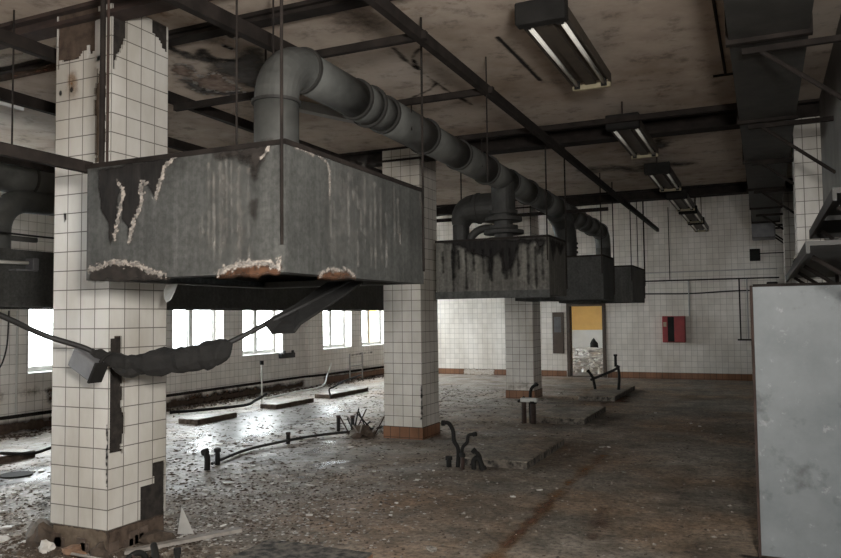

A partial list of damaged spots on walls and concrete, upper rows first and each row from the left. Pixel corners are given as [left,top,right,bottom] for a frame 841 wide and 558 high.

peeling [0,53,39,67]
water stain [168,47,265,88]
peeling [58,7,177,244]
water stain [442,239,565,292]
peeling [110,337,121,353]
peeling [106,367,124,487]
peeling [53,461,164,551]